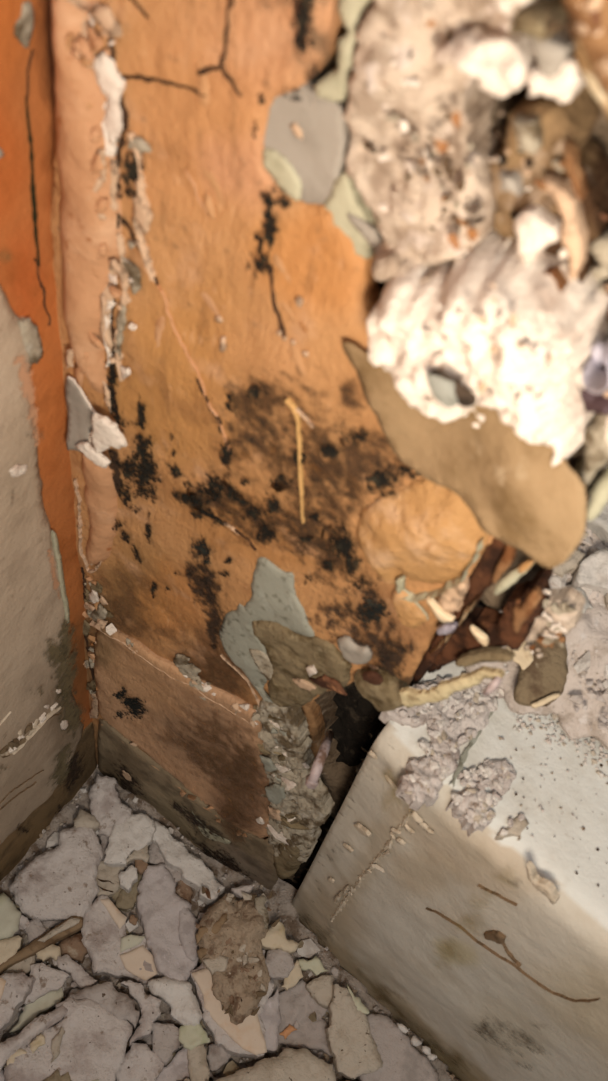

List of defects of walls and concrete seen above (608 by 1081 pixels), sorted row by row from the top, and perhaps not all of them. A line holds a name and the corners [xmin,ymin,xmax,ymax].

crack [25,49,51,326]
peeling [65,25,104,69]
damp [116,151,147,199]
crack [67,0,242,451]
crack [269,264,309,357]
flaking render [262,0,586,265]
peeling [0,286,84,843]
damp [100,352,421,693]
peeling [175,785,247,844]
flaking render [219,557,529,888]